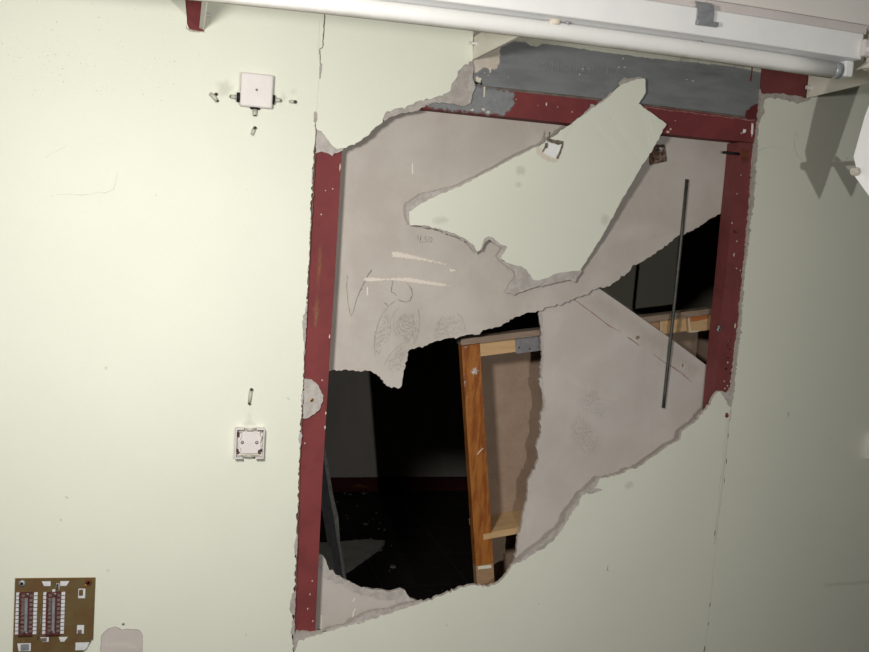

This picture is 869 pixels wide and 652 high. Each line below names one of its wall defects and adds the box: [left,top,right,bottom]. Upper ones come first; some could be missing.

peeling [465,76,483,103]
crack [306,14,325,320]
spalling [538,312,546,417]
crack [292,342,306,652]
spalling [318,556,406,603]